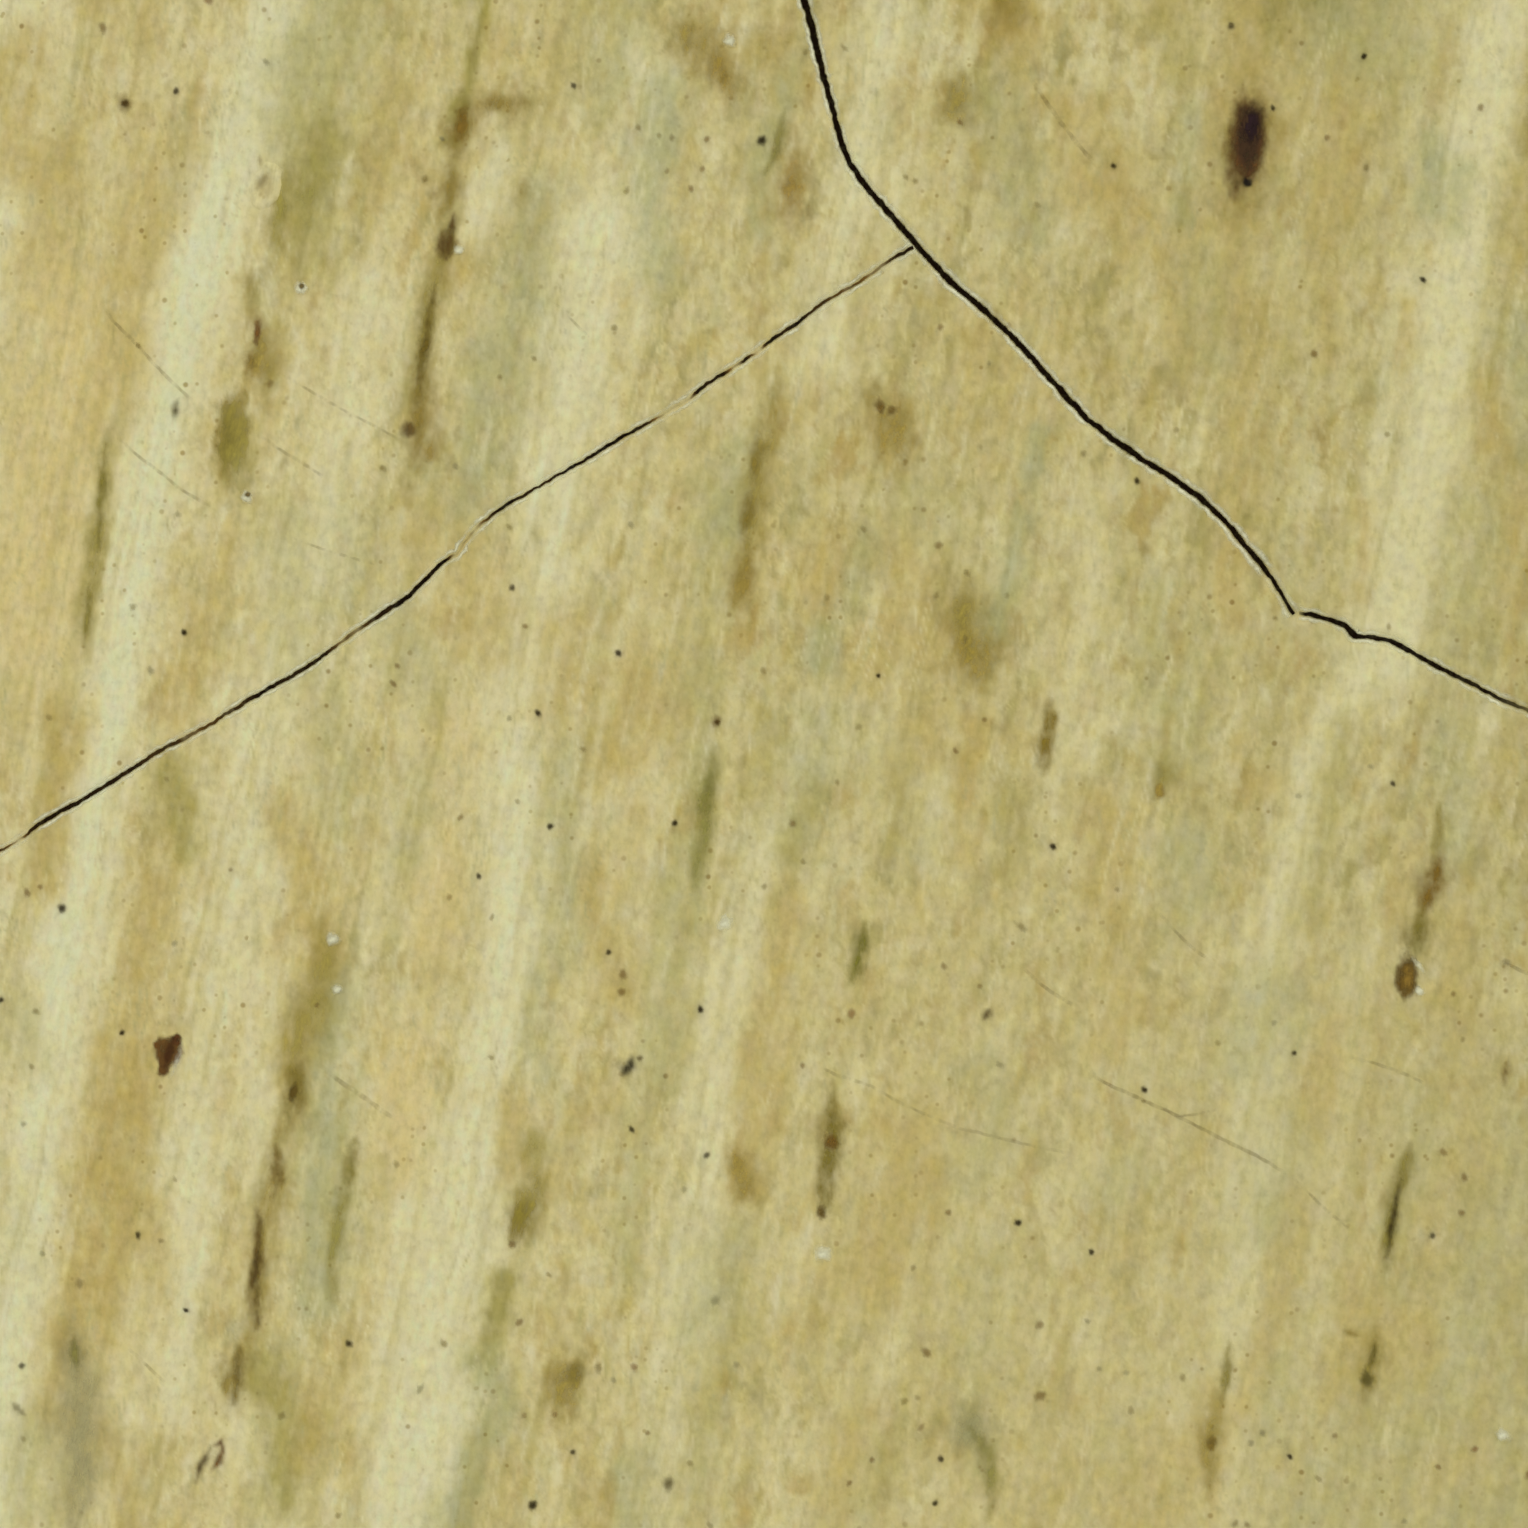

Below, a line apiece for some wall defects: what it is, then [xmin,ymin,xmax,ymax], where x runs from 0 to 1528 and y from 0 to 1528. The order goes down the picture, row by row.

crack [0,0,1528,855]